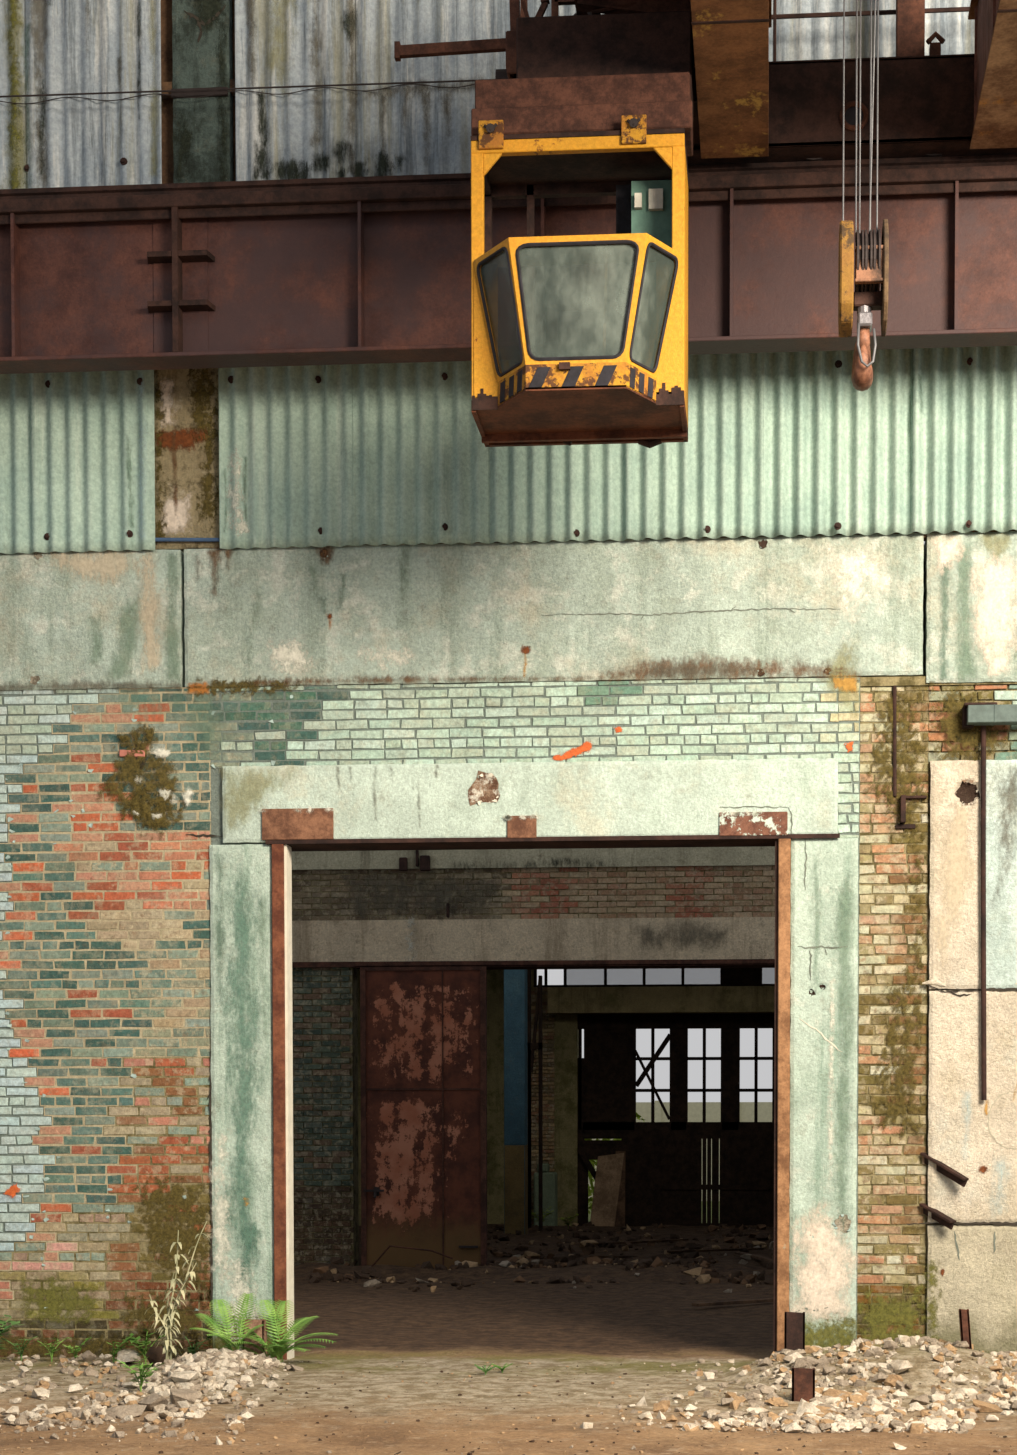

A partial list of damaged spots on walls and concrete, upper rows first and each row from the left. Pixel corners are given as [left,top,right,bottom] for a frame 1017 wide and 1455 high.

leakage [8,0,47,189]
leakage [254,0,475,180]
peeling [34,550,137,582]
leakage [611,659,843,680]
peeling [933,537,964,571]
peeling [971,557,1017,675]
spalling [468,771,525,820]
peeling [0,639,349,1347]